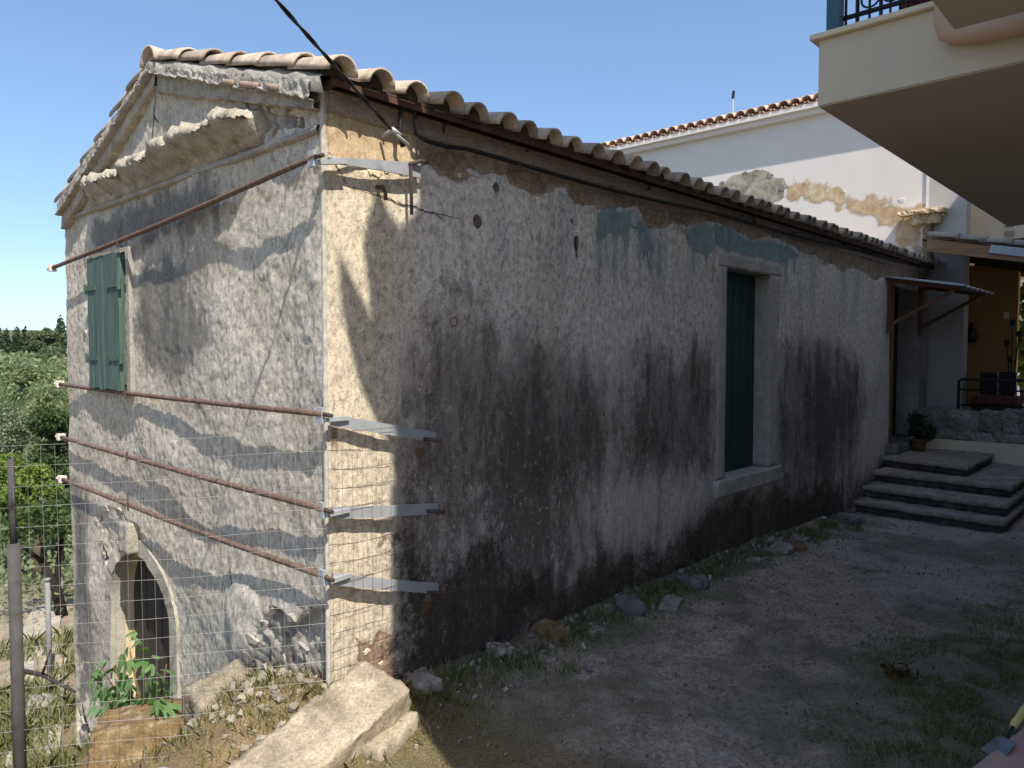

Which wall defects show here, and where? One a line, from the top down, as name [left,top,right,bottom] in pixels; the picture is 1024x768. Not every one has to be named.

flaking render [327,112,927,286]
leakage [378,516,542,680]